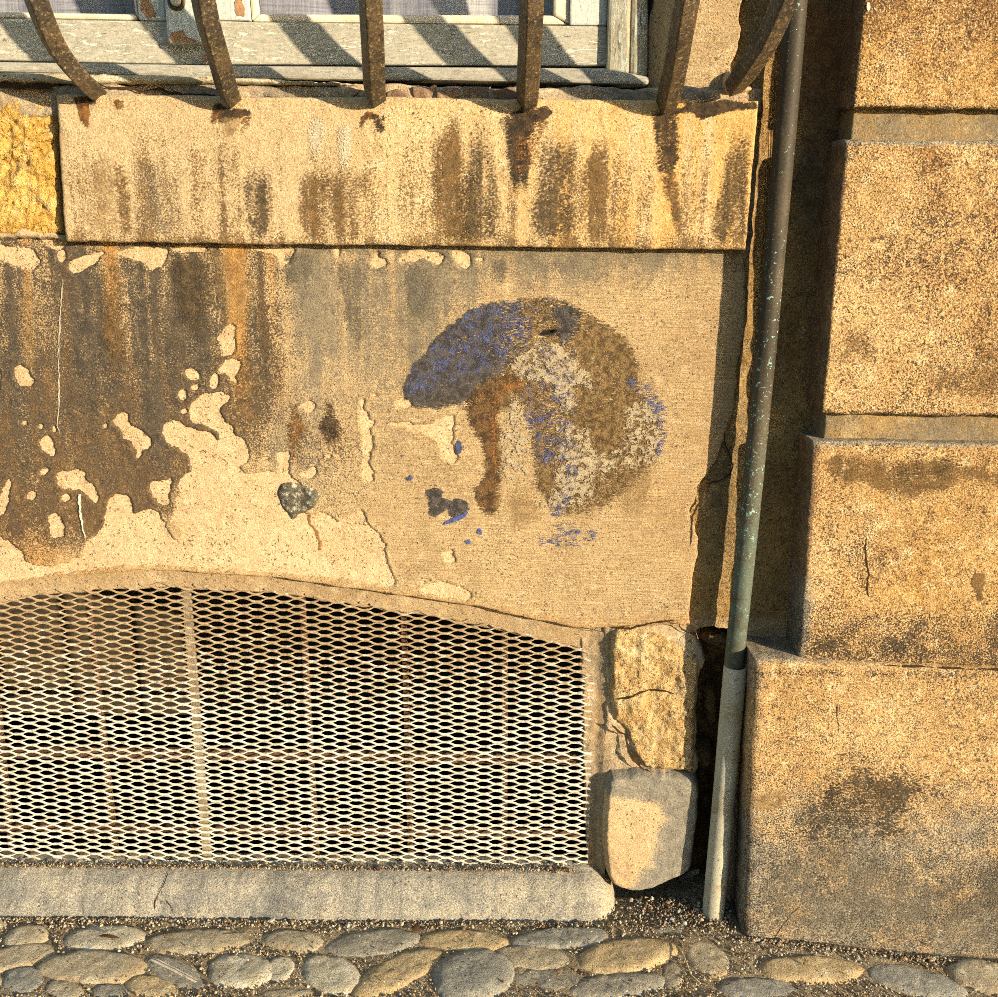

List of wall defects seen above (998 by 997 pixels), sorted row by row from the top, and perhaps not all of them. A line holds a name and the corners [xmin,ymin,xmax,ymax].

rust [211,103,251,132]
rust [501,106,552,191]
rust [653,99,758,235]
peeling [45,239,104,274]
damp [101,263,127,375]
peeling [117,245,207,271]
damp [169,256,211,344]
peeling [0,323,395,586]
crack [690,431,733,546]
crack [617,689,675,700]
crack [612,725,669,773]
damp [764,748,998,951]